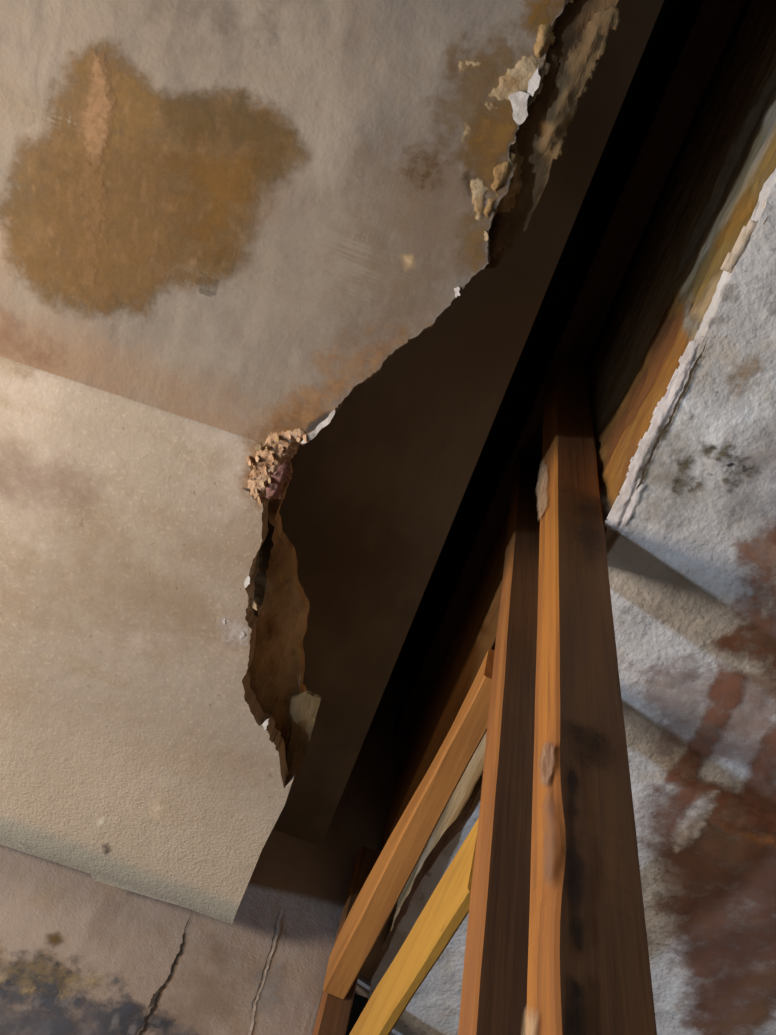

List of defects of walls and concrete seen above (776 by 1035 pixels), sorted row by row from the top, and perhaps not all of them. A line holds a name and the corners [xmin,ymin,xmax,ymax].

water stain [0,44,306,313]
spalling [442,0,621,271]
water stain [595,66,776,510]
peeling [222,408,337,784]
crack [139,912,192,1035]
crack [249,906,284,1035]